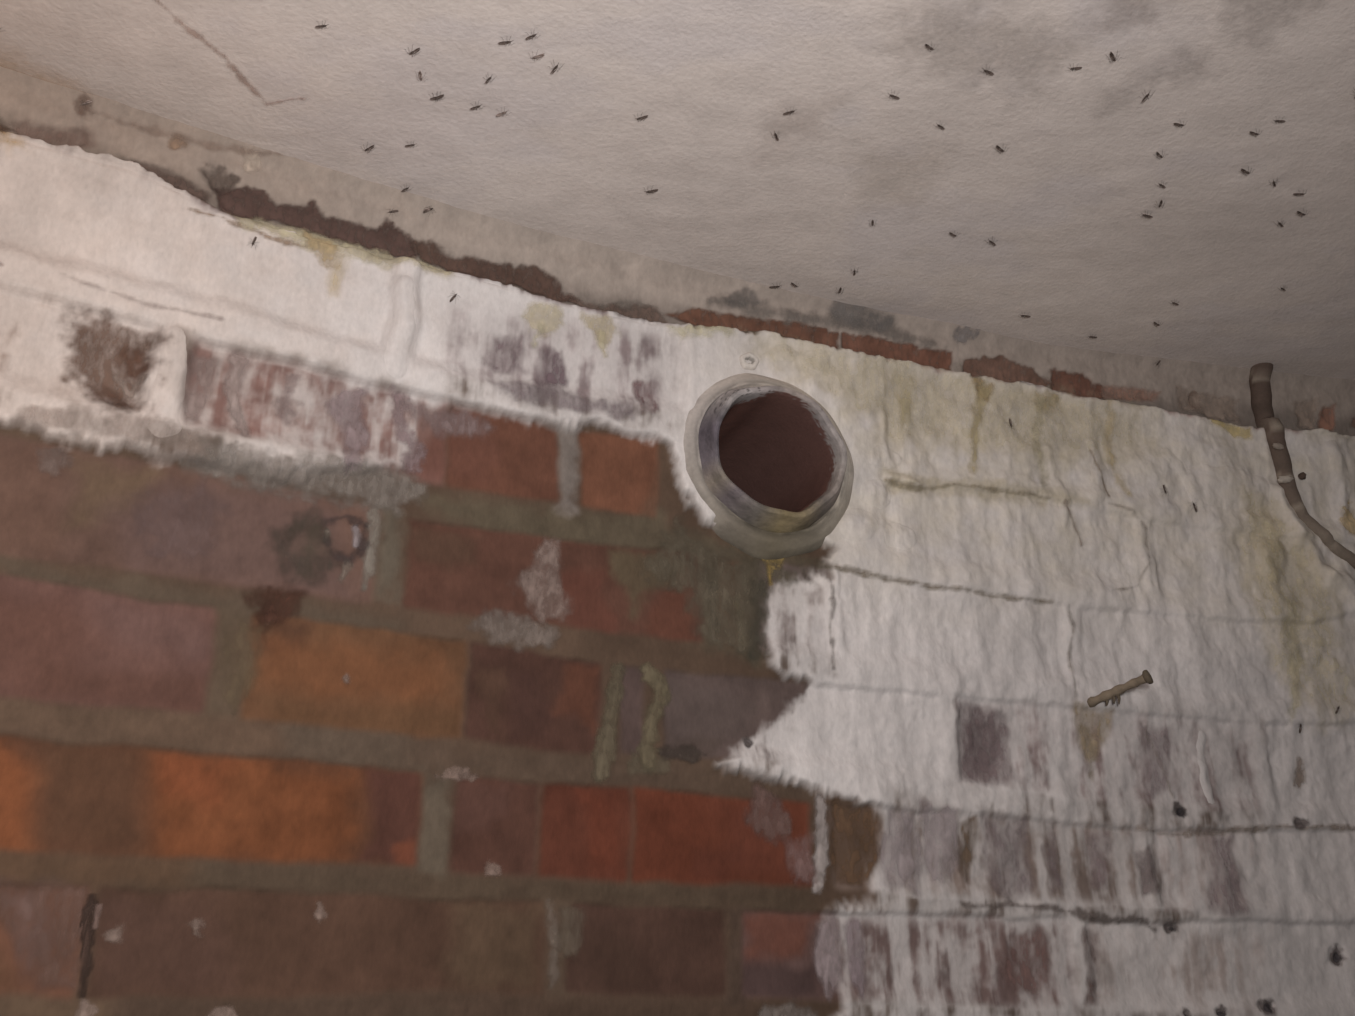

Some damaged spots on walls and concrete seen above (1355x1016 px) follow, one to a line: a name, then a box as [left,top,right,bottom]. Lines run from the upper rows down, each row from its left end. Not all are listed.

crack [158,1,303,102]
spalling [0,124,87,146]
spalling [135,149,1157,400]
peeling [63,317,161,409]
peeling [493,341,657,419]
crack [79,894,102,997]